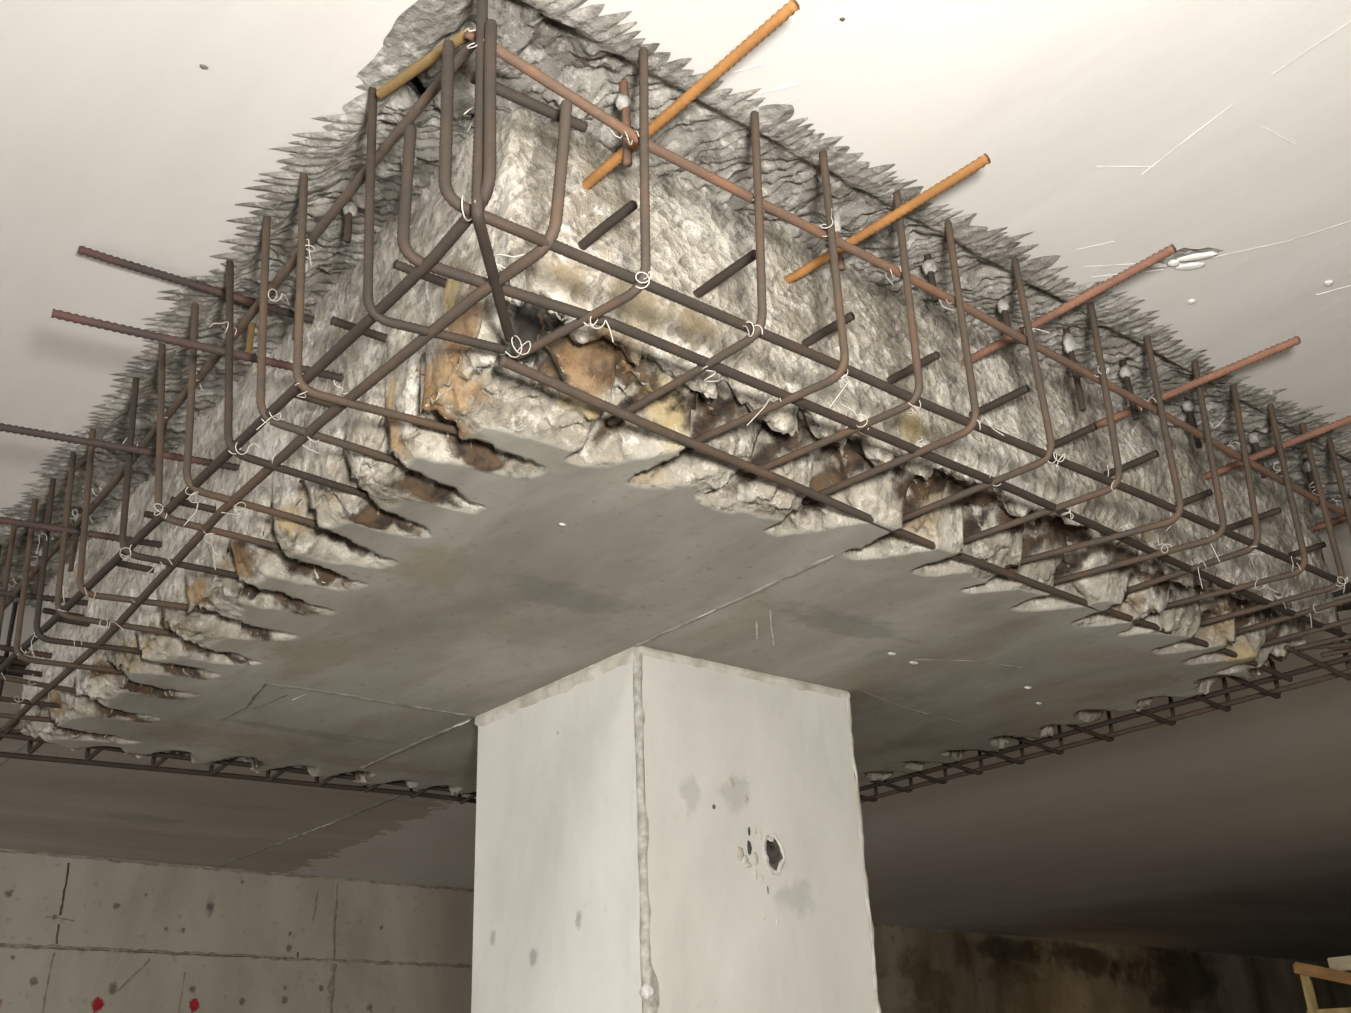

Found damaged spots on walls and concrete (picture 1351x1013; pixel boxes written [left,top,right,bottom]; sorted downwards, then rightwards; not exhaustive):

rust [582,0,800,190]
rust [784,153,991,284]
rust [961,244,1177,367]
spalling [1148,247,1224,270]
rust [419,279,509,472]
rust [280,552,348,586]
rust [279,511,368,556]
rust [347,503,420,534]
rust [384,472,459,507]
rust [536,321,1201,599]
rust [91,638,249,699]
spalling [19,281,1306,1013]